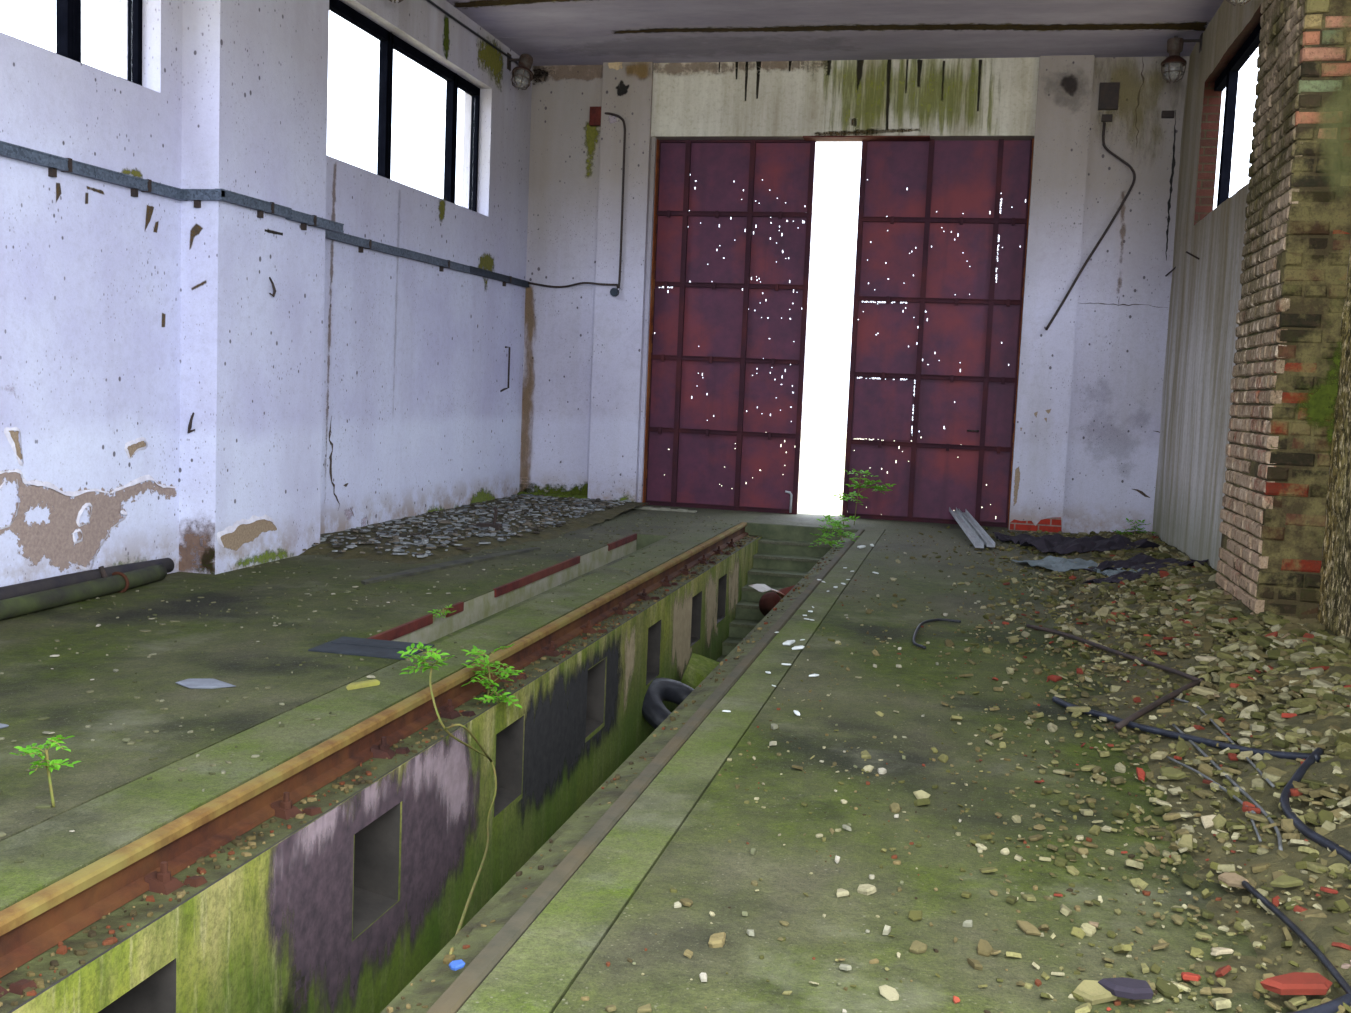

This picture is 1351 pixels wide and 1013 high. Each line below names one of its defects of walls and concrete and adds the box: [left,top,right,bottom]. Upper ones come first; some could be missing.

water stain [654,60,832,101]
water stain [886,59,923,130]
peeling [0,427,177,572]
peeling [217,514,277,551]
crack [329,417,354,516]
water stain [672,559,739,676]
water stain [624,629,635,707]
spalling [0,522,885,1013]